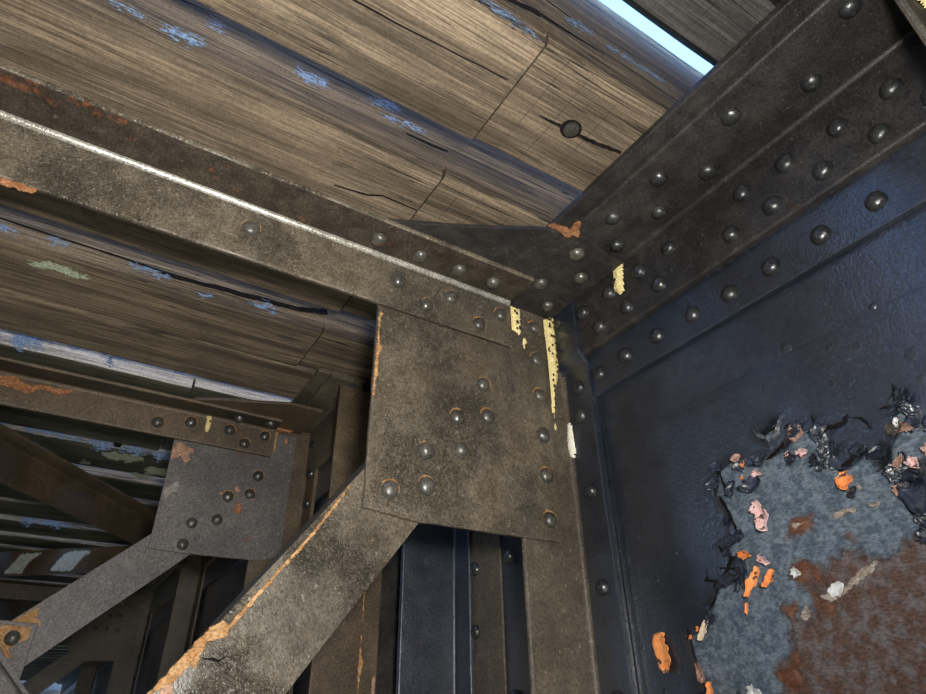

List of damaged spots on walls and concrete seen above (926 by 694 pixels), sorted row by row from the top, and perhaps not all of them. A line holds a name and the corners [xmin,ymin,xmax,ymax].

rust [0,177,38,194]
rust [549,221,581,238]
rust [0,375,73,395]
rust [171,442,194,463]
rust [164,481,180,498]
peeling [608,284,926,694]
rust [147,485,350,694]
rust [0,606,42,658]